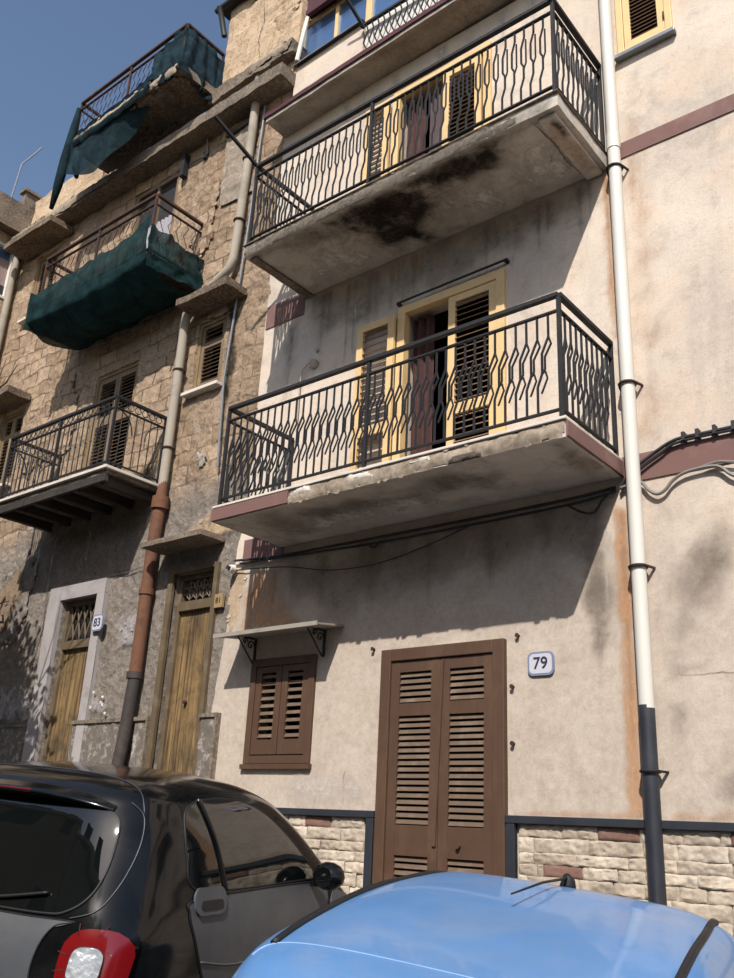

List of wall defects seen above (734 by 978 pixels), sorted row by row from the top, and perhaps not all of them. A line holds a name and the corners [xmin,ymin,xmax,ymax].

water stain [301,128,569,278]
spalling [283,419,565,505]
corrosion [609,510,641,813]